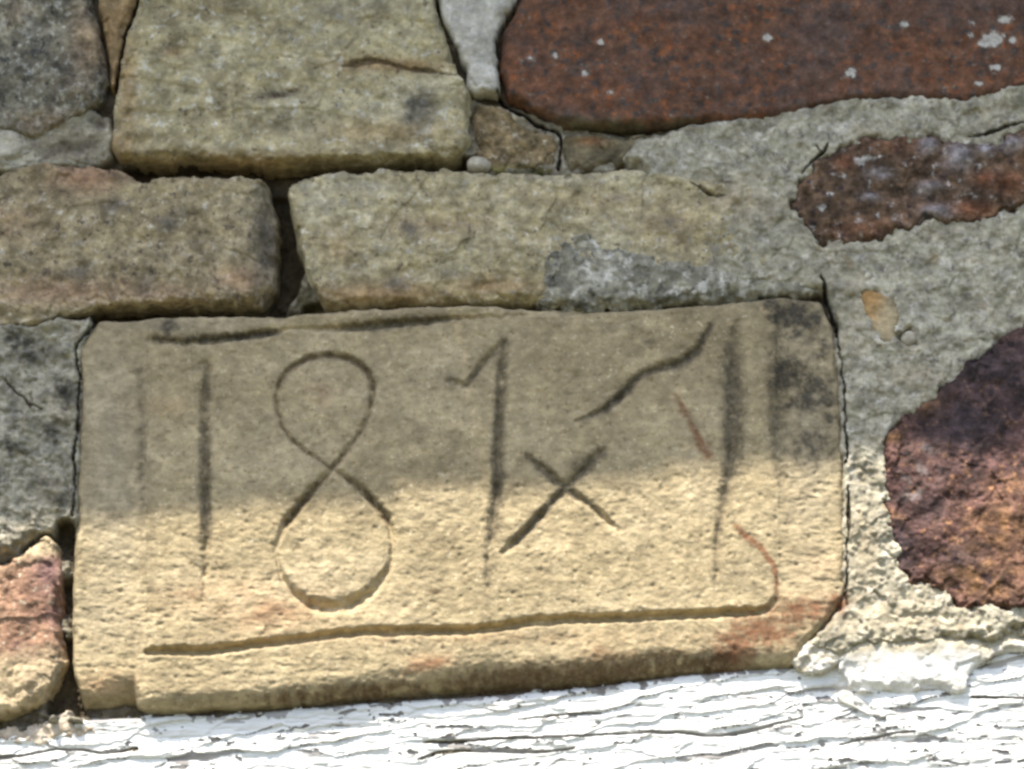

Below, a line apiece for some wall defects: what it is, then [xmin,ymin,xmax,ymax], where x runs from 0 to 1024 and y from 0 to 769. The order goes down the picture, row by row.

crack [820,276,851,605]
peeling [0,630,1024,769]